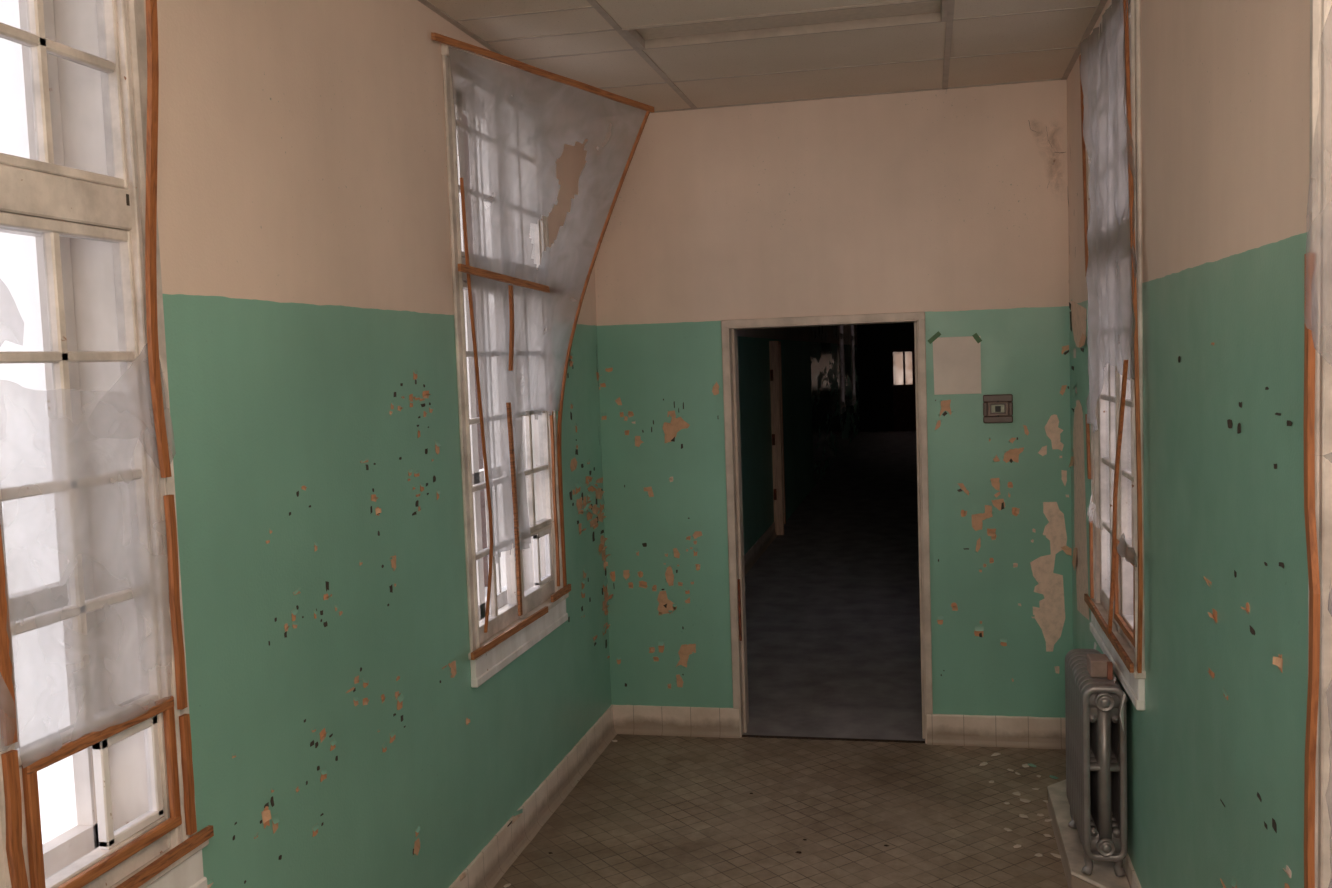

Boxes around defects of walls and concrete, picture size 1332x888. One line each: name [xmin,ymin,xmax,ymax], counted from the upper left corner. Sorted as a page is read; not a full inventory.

peeling [389,369,441,516]
peeling [568,397,702,689]
peeling [957,300,1089,674]